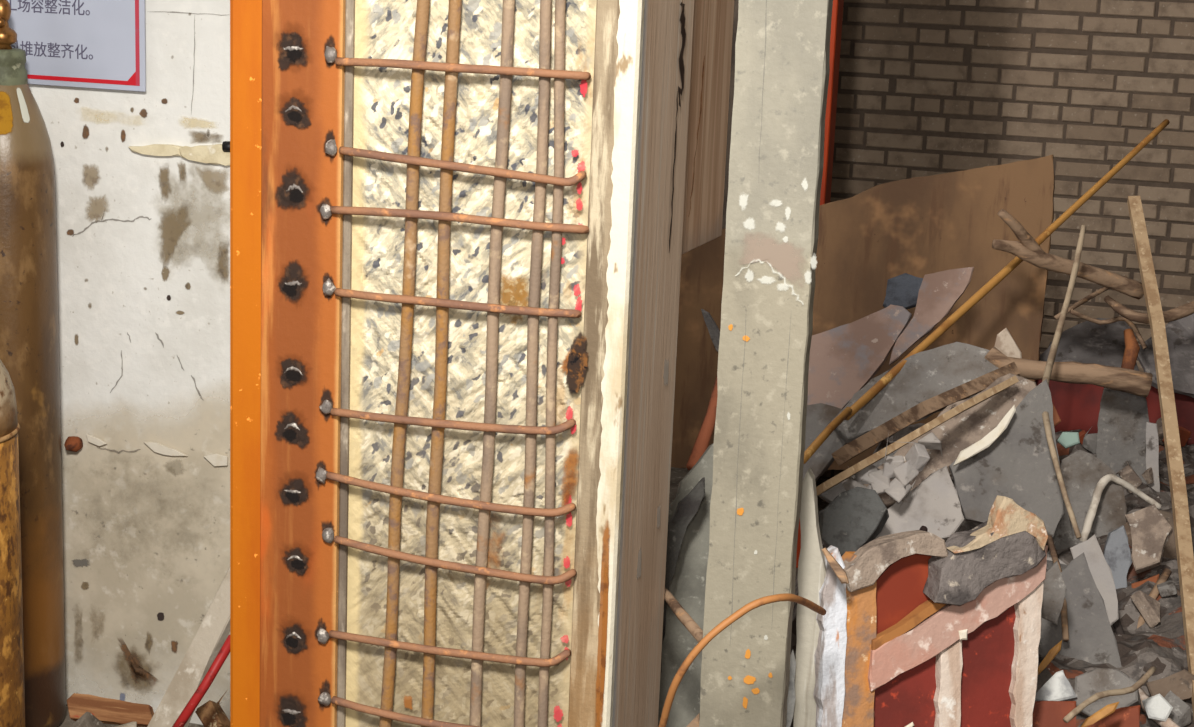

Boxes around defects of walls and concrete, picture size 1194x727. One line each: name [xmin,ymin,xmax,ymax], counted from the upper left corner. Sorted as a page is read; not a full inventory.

crack [669,0,705,251]
rust [560,332,588,394]